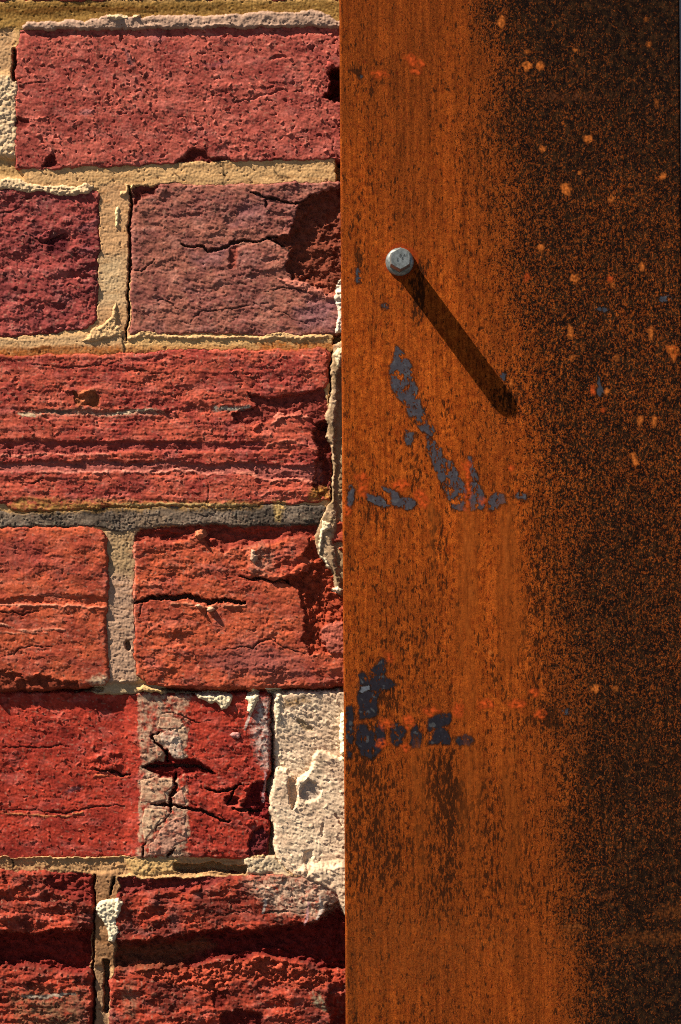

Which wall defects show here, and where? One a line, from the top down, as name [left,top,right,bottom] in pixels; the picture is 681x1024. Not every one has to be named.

crack [181,236,289,253]
peeling [389,346,527,511]
crack [131,576,289,605]
peeling [346,658,474,759]
crack [95,732,262,823]